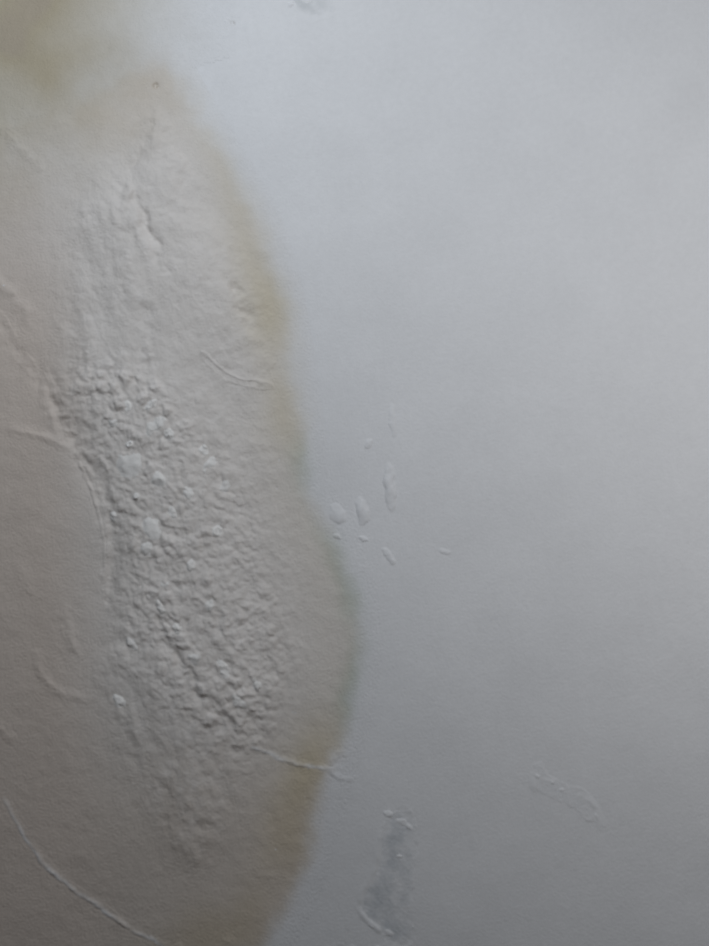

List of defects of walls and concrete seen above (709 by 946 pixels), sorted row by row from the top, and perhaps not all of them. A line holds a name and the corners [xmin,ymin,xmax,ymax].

damp [0,0,383,946]